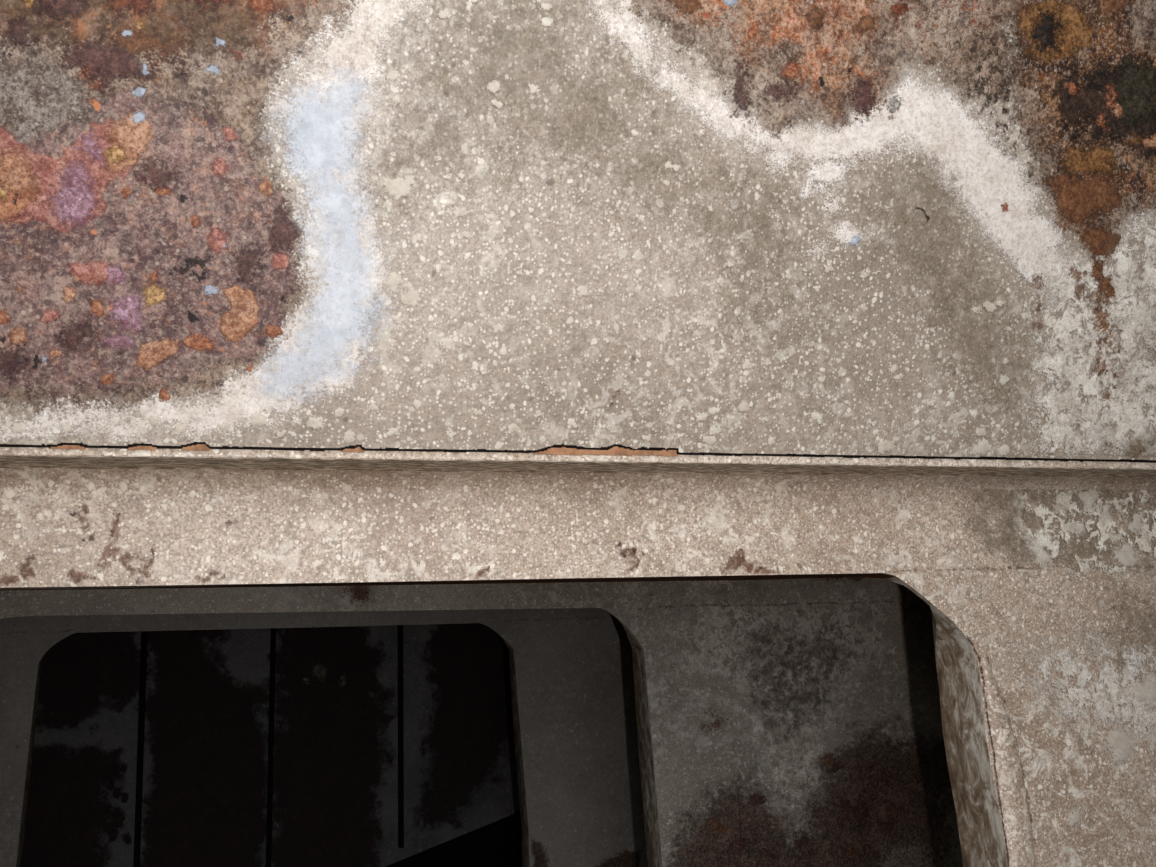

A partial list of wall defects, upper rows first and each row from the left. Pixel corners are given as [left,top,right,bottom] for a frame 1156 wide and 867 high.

rust [0,0,359,419]
water stain [0,0,429,443]
water stain [573,0,1156,458]
rust [629,0,1156,409]
spalling [533,444,679,457]
water stain [664,578,903,824]